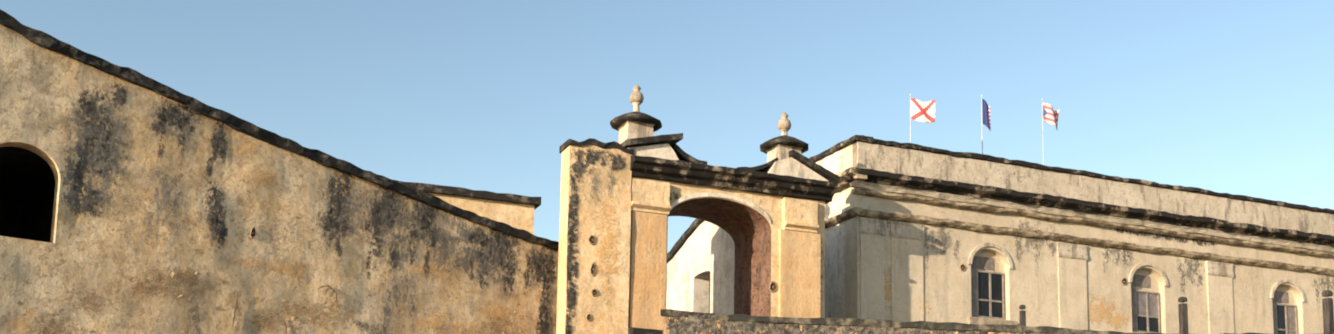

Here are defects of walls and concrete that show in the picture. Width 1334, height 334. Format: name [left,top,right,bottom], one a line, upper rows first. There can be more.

water stain [62,83,126,217]
water stain [145,101,228,248]